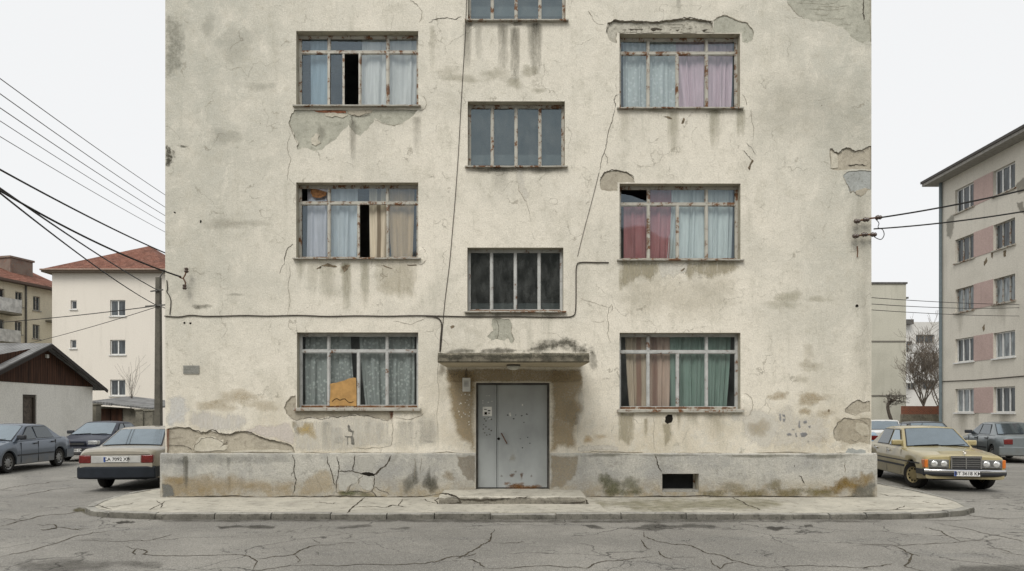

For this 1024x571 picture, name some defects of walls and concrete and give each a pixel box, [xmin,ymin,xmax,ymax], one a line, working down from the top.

spalling [606,15,754,43]
flaking render [787,0,871,43]
flaking render [289,109,417,151]
crack [600,95,616,169]
flaking render [830,146,871,197]
mould [439,340,588,362]
flaking render [167,427,295,453]
crack [277,363,526,507]
peeling [833,400,871,445]
crack [97,495,252,509]
crack [554,496,613,504]
water stain [853,484,875,497]